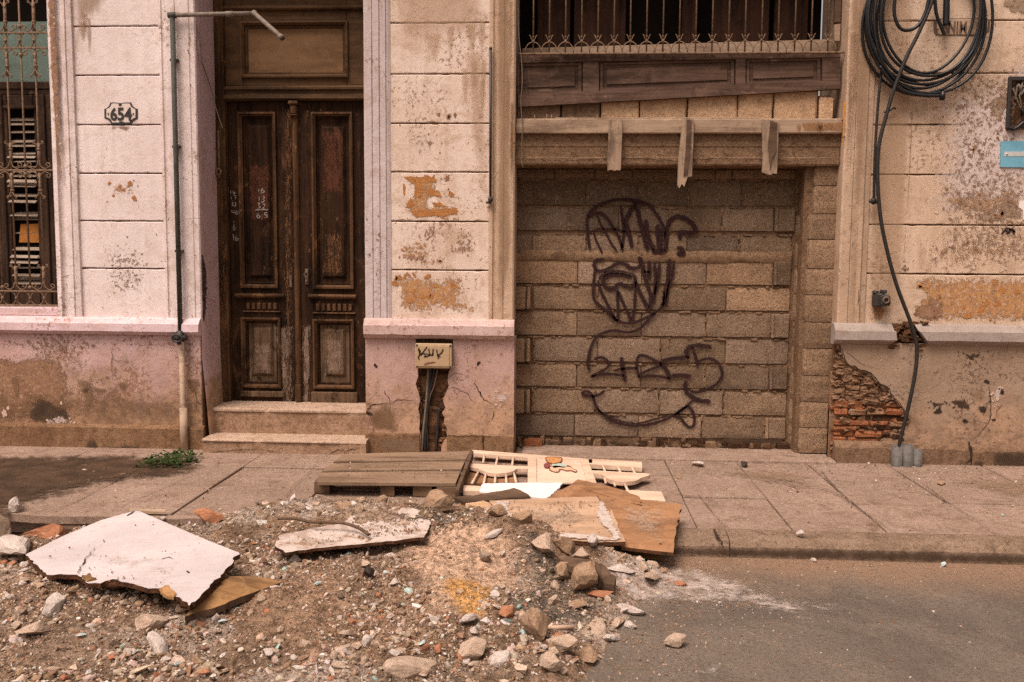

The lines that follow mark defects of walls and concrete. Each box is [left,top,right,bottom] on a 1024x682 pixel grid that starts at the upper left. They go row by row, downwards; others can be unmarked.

peeling [403,175,458,218]
peeling [888,64,1024,351]
peeling [372,242,476,313]
leakage [4,380,69,421]
spalling [416,368,450,452]
crack [448,373,513,449]
flaking render [826,344,909,458]
flaking render [928,381,1004,423]